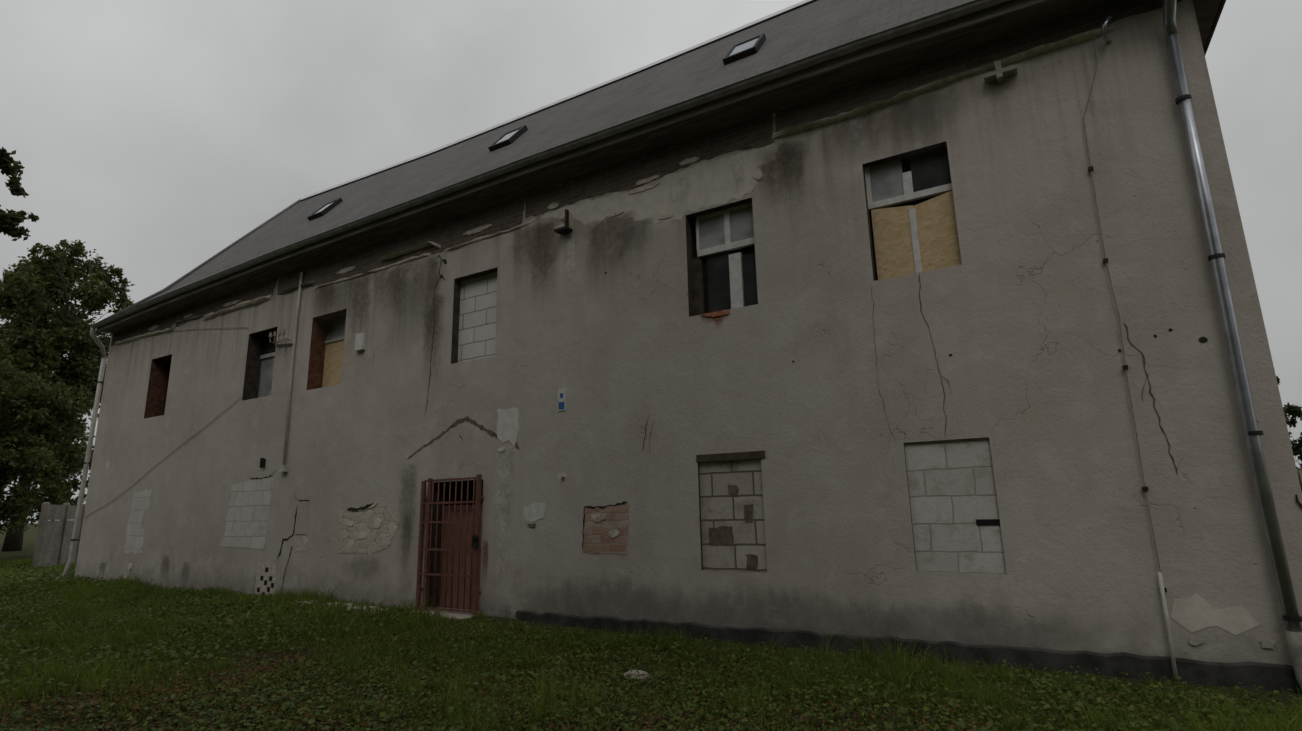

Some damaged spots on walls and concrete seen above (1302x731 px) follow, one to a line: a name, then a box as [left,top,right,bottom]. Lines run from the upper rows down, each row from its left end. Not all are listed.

flaking render [111,0,1183,346]
crack [407,254,520,459]
crack [919,274,951,433]
flaking render [337,502,401,556]
flaking render [582,504,630,555]